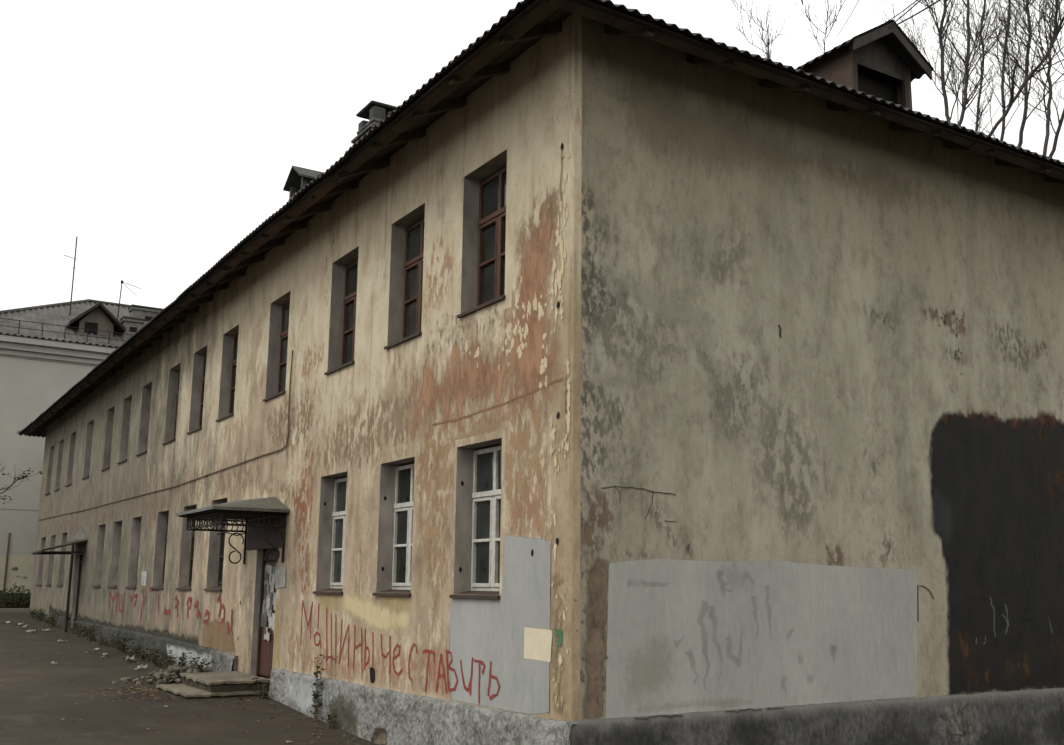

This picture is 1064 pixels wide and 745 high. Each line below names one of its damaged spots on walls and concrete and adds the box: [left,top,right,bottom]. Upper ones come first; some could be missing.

peeling [409,149,570,474]
crack [601,486,676,522]